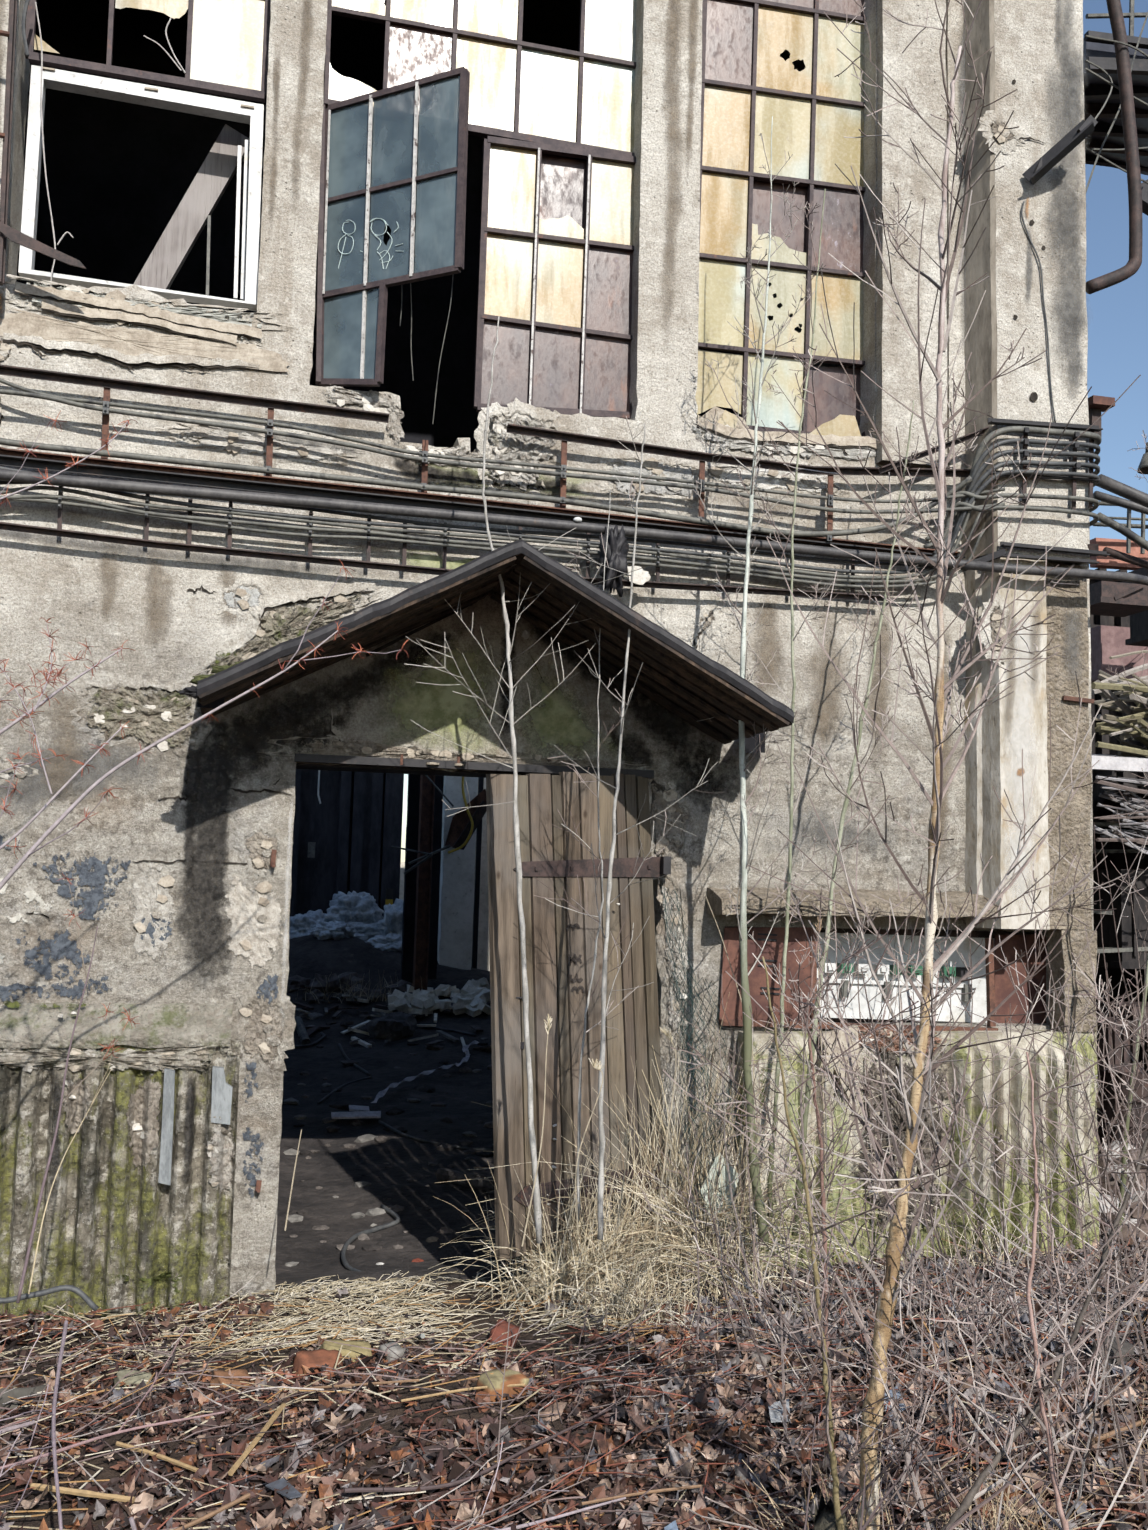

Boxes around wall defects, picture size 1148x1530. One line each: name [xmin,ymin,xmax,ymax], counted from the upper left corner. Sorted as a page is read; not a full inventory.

leakage [1049,0,1084,384]
spalling [0,336,25,366]
flaking render [0,274,295,350]
spalling [323,384,571,505]
spalling [64,571,384,764]
spalling [0,747,39,790]
leakage [177,734,238,980]
spalling [0,818,296,1173]
leakage [50,1075,62,1198]
leakage [182,1079,196,1183]